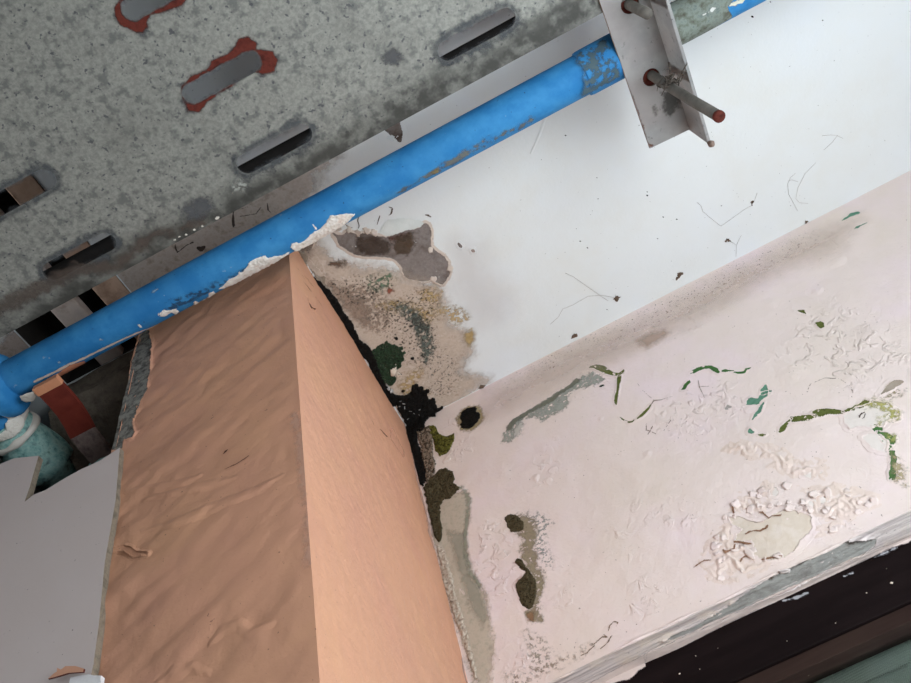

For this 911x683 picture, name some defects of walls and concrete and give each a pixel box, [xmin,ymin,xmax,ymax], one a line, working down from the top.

spalling [298,242,330,289]
spalling [330,218,453,287]
water stain [304,246,489,487]
peeling [838,376,909,486]
water stain [432,486,494,683]
peeling [658,426,882,645]